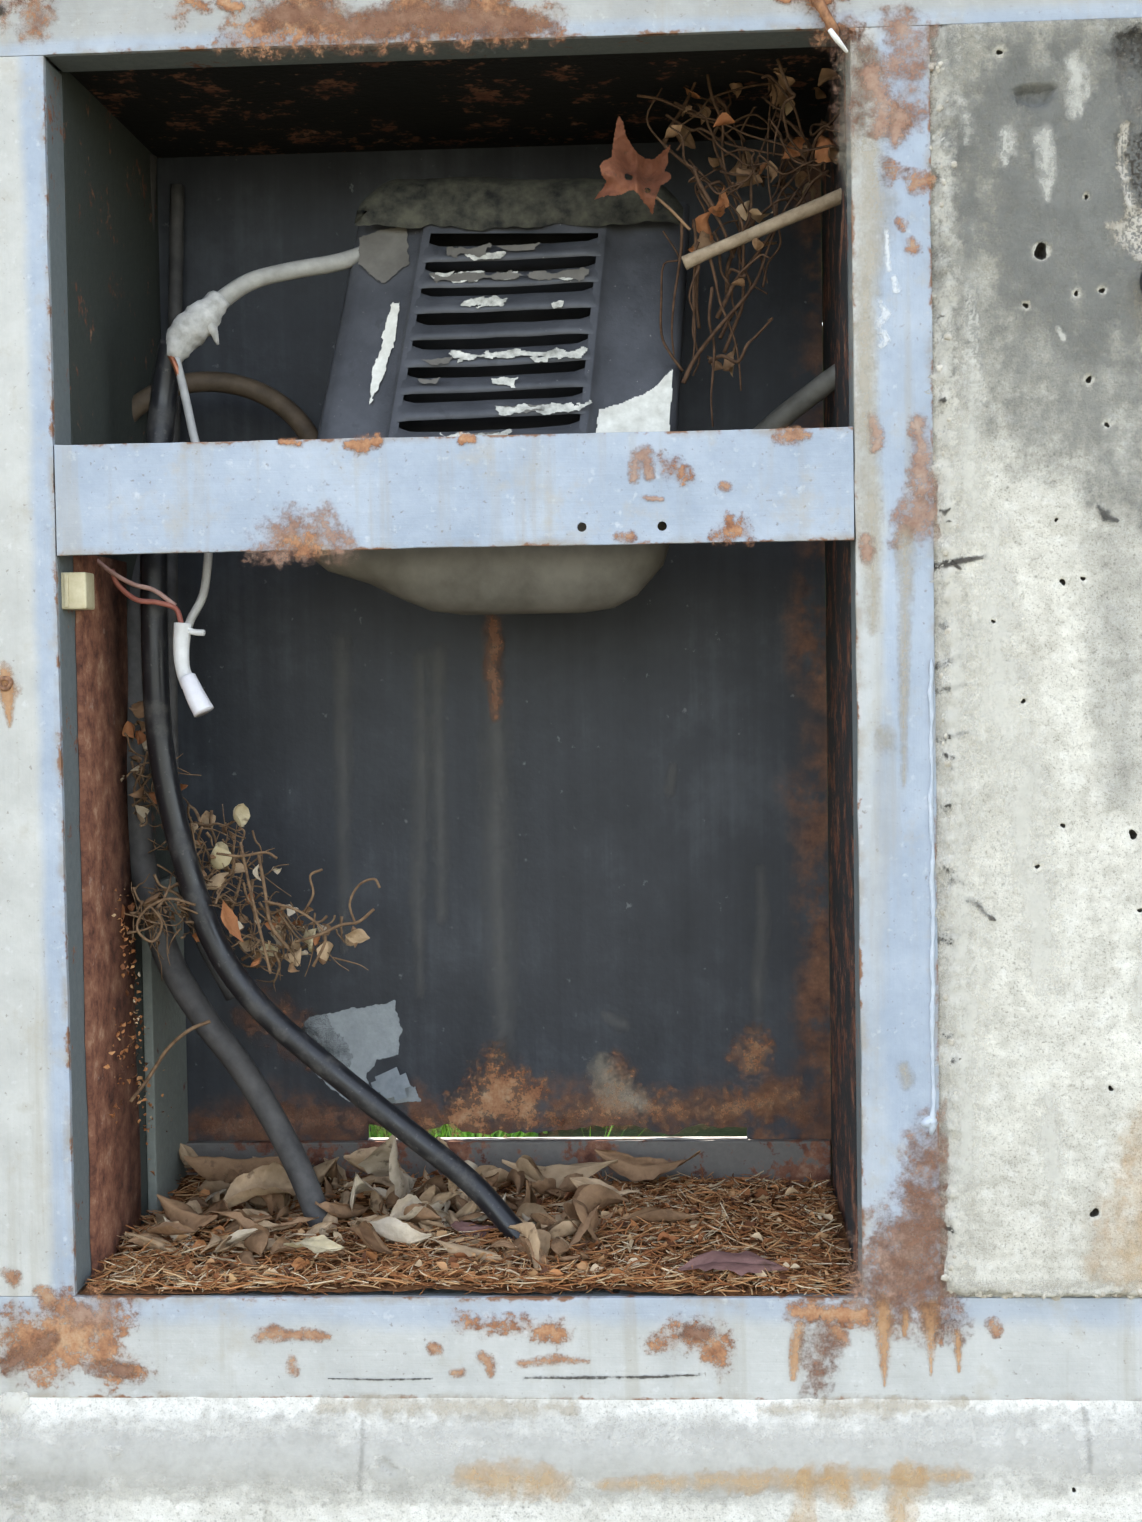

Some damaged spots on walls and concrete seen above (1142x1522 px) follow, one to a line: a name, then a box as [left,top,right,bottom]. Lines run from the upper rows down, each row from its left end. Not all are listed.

corrosion [172,0,566,57]
corrosion [776,0,938,192]
corrosion [629,446,695,501]
corrosion [859,415,940,562]
corrosion [251,508,355,564]
corrosion [708,515,753,544]
corrosion [412,1029,802,1138]
corrosion [786,1104,965,1395]
corrosion [0,1270,156,1393]
corrosion [254,1324,331,1376]
corrosion [455,1308,590,1378]
corrosion [647,1319,735,1373]